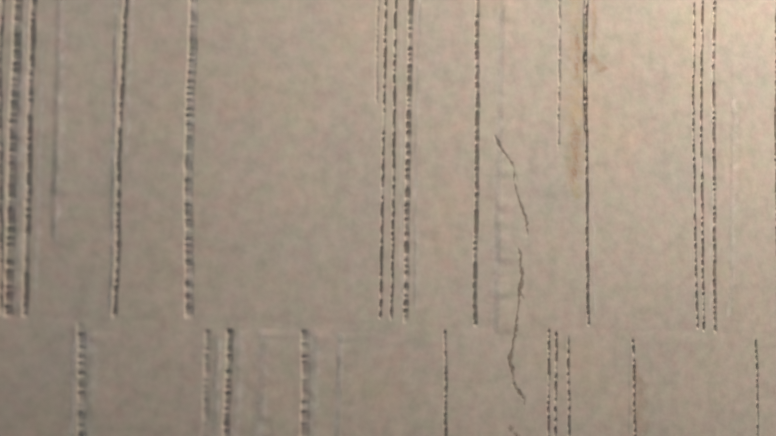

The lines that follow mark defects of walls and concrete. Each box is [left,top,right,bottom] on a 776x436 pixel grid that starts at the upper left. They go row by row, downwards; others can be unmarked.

crack [495,138,528,405]